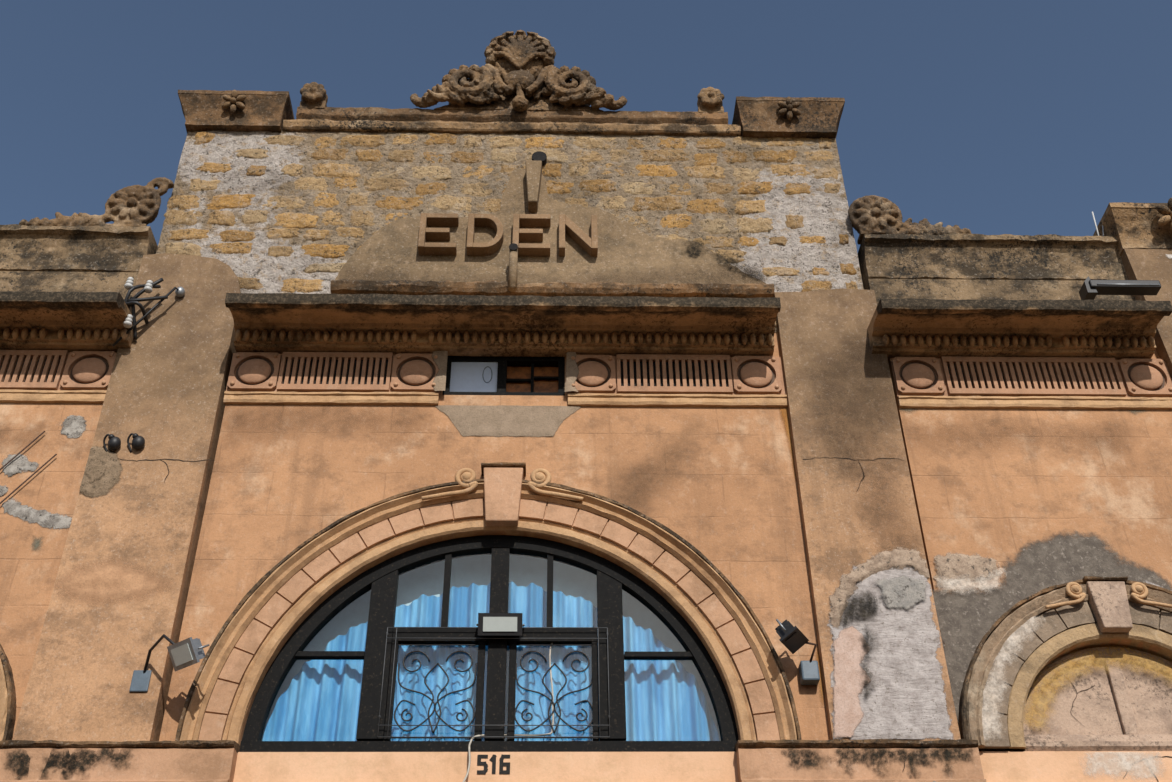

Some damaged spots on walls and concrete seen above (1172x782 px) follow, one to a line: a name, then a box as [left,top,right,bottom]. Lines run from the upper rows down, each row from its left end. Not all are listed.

peeling [827,531,1172,740]
water stain [6,748,129,780]
water stain [784,748,820,767]
water stain [837,748,972,779]